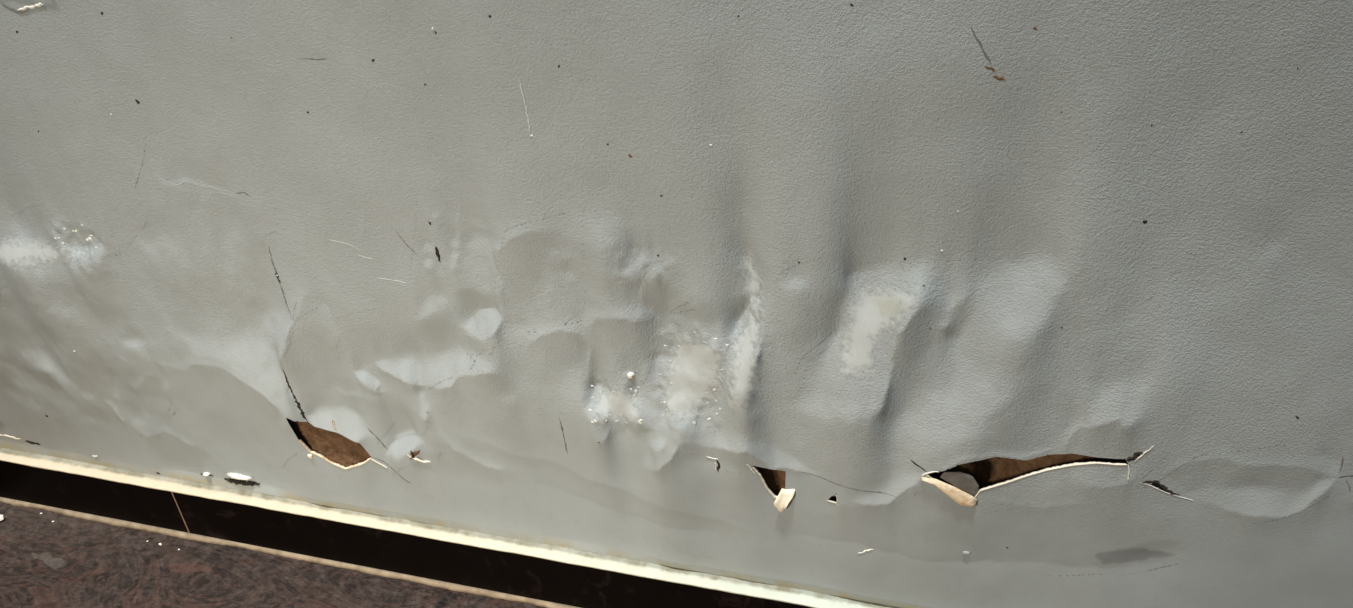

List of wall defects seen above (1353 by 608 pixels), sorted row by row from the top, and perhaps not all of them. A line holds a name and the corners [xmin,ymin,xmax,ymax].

damp [0,243,58,265]
damp [731,262,759,407]
damp [843,292,913,373]
damp [596,388,637,418]
damp [665,344,720,417]
flaking render [291,420,371,467]
flaking render [758,467,786,496]
flaking render [937,454,1127,491]